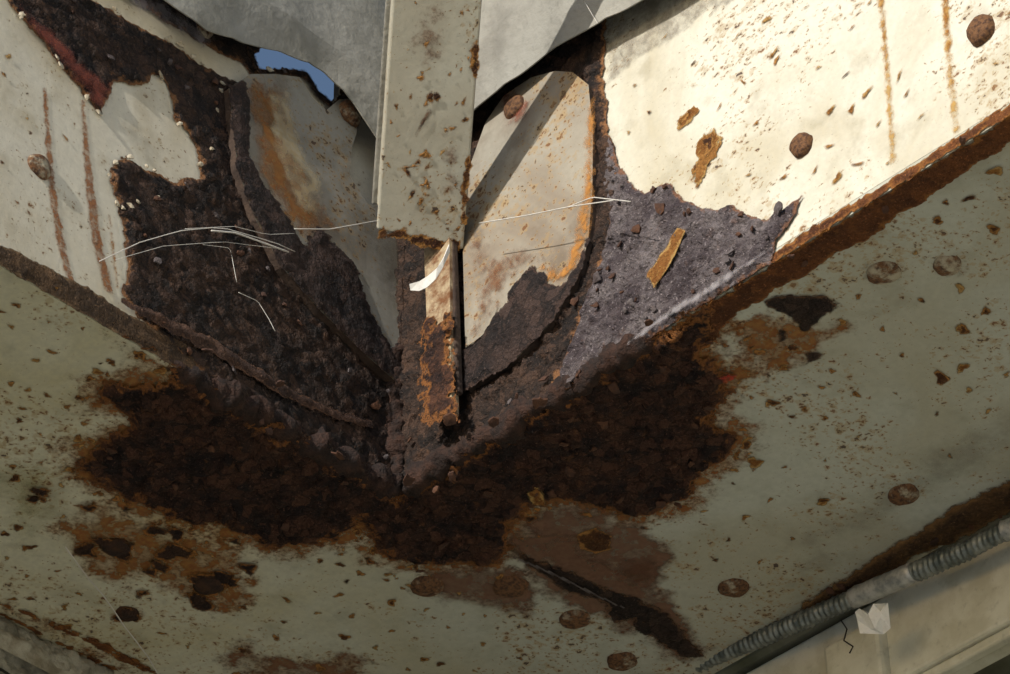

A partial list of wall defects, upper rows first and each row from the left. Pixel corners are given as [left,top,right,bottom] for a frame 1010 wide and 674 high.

corrosion [448,40,480,79]
corrosion [867,0,901,165]
corrosion [943,0,957,112]
peeling [9,0,391,469]
corrosion [0,83,1010,617]
peeling [538,137,802,383]
peeling [732,295,851,377]
corrosion [220,641,367,674]